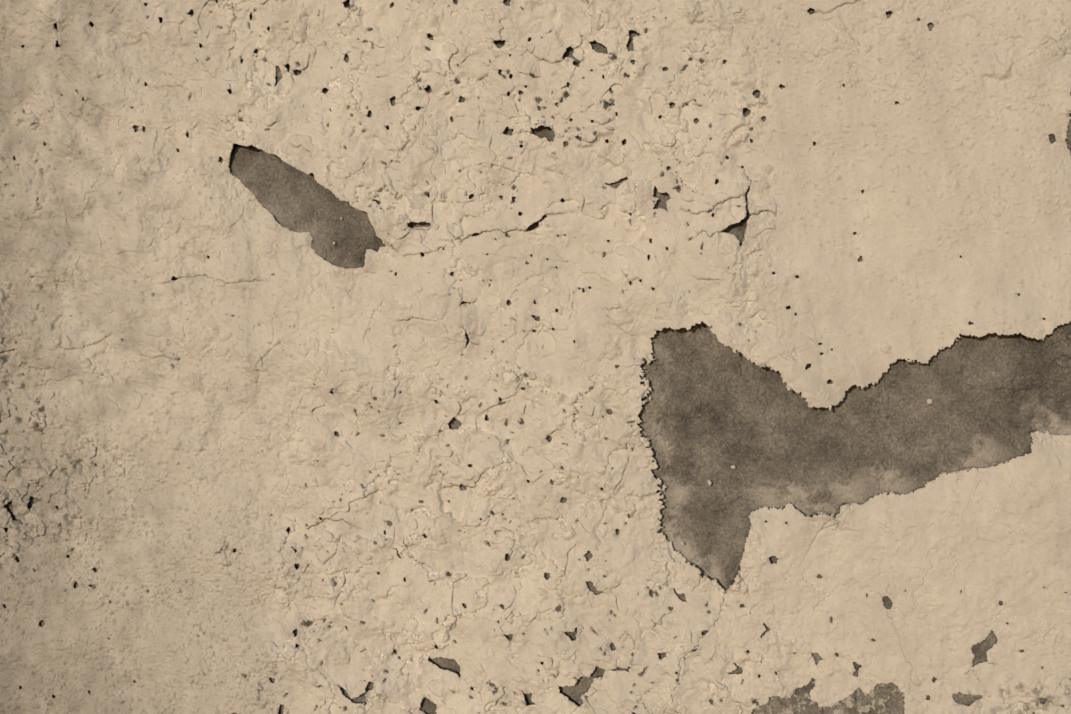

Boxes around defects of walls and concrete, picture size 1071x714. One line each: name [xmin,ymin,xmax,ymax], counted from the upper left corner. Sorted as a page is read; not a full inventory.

peeling [275,63,301,86]
peeling [563,47,604,79]
peeling [589,41,608,54]
peeling [624,30,641,78]
spalling [1049,84,1071,221]
spalling [219,134,395,281]
crack [385,213,562,256]
peeling [653,156,690,211]
crack [680,166,773,248]
spalling [628,181,1071,607]
spalling [740,653,914,714]
spalling [952,630,1071,714]